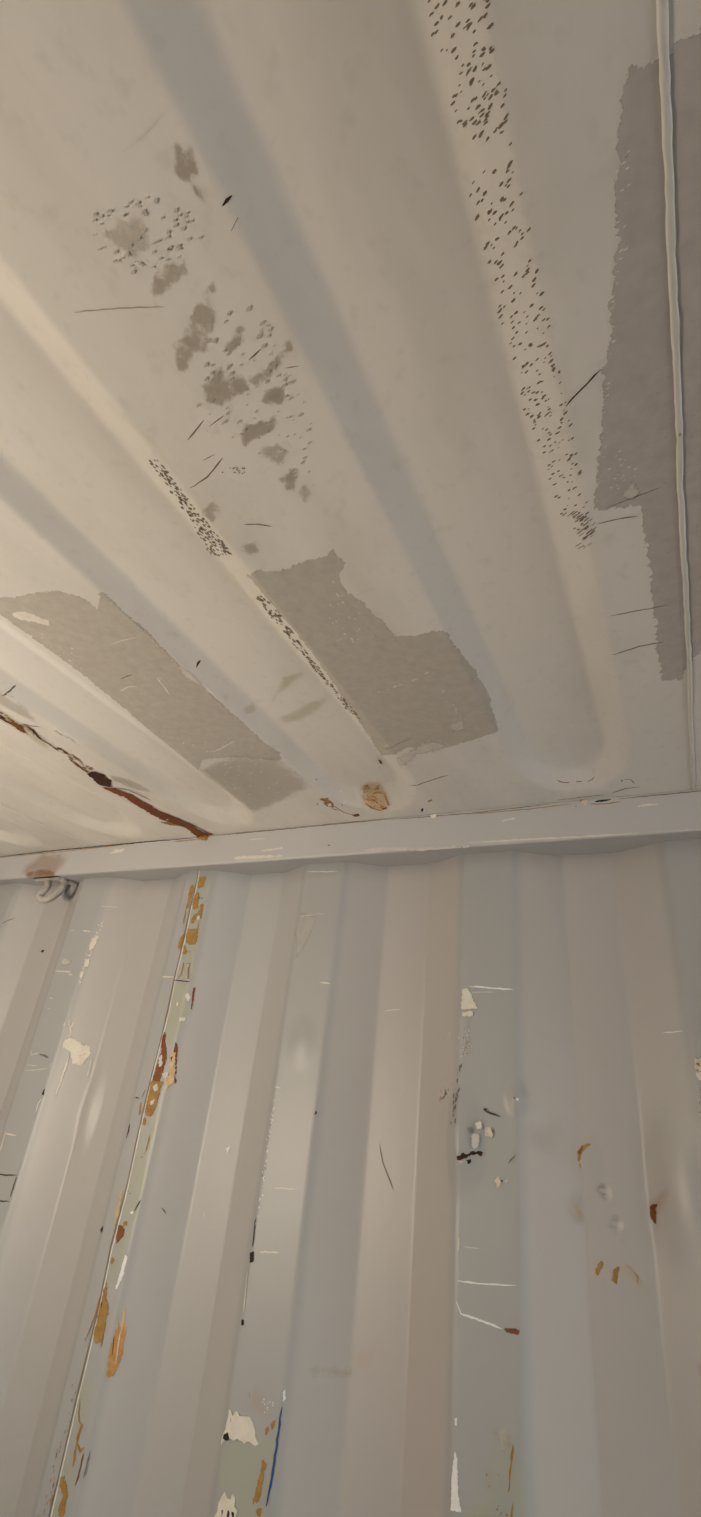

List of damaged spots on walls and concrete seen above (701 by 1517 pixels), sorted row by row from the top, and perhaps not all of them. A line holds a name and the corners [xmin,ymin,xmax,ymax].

peeling [12,611,51,626]
rust [0,712,212,842]
rust [317,785,390,817]
rust [162,876,206,982]
rust [126,1032,178,1157]
rust [100,1190,140,1264]
rust [85,1283,127,1378]
rust [38,1384,90,1517]
peeling [221,1409,259,1446]
peeling [214,1491,238,1517]